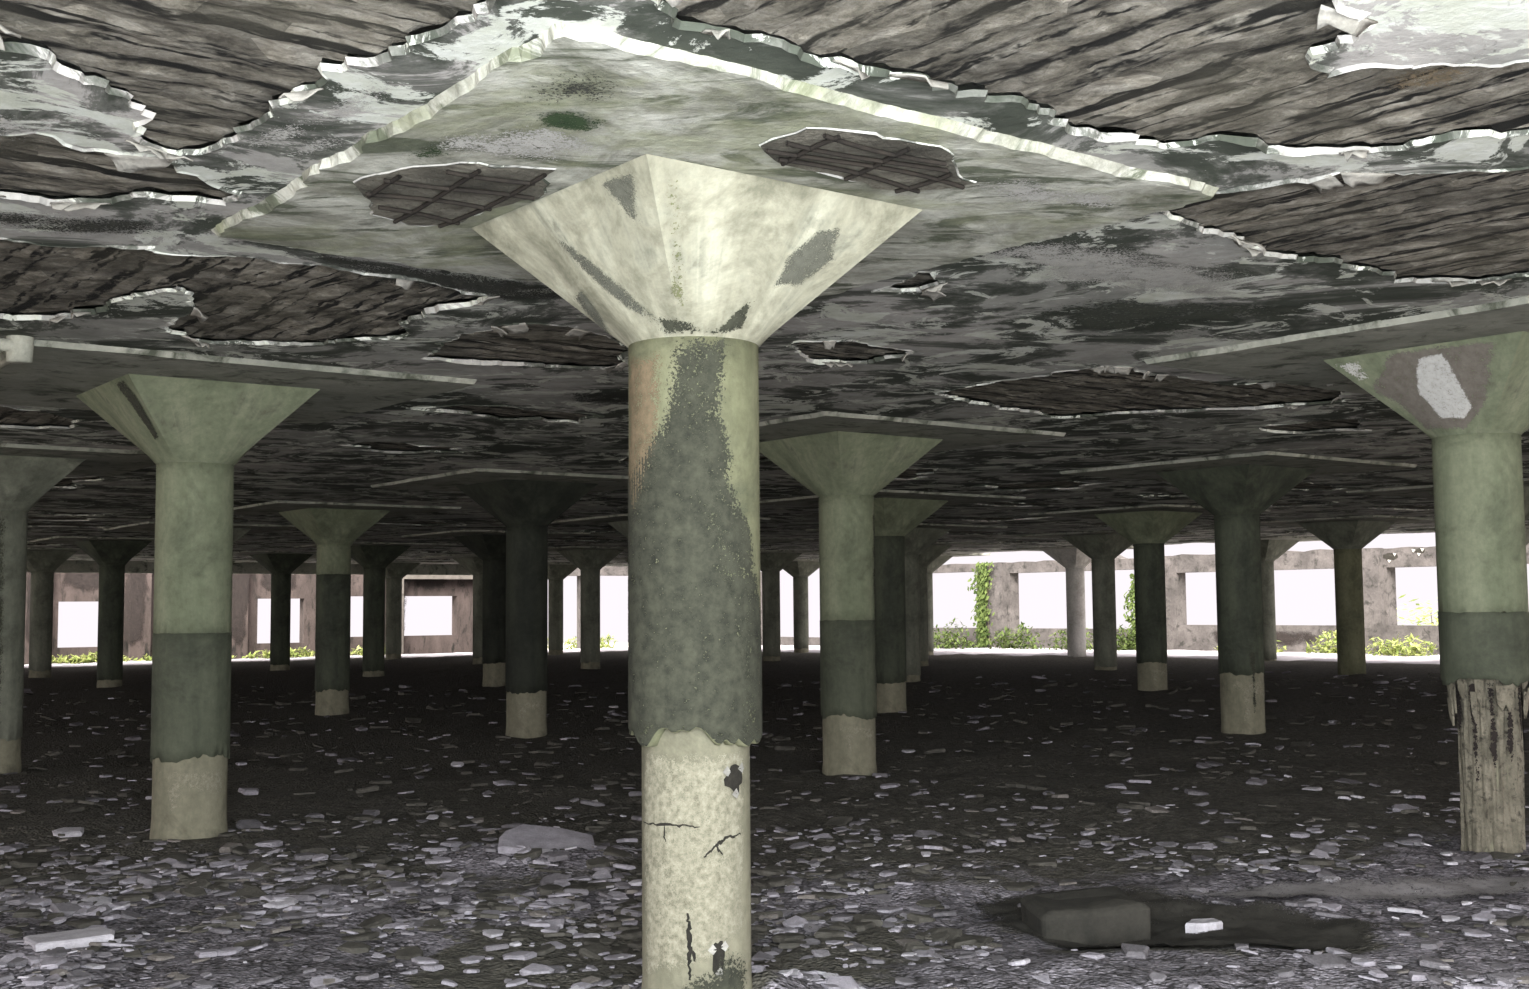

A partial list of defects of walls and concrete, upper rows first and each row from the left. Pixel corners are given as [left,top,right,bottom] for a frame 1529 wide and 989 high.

spalling [0,0,496,212]
spalling [654,0,1529,287]
spalling [353,161,557,228]
spalling [0,237,500,349]
spalling [871,271,948,302]
spalling [406,404,605,424]
spalling [420,322,628,373]
spalling [786,339,915,368]
spalling [933,361,1372,434]
peeling [1416,354,1471,419]
peeling [643,749,746,980]
crack [686,913,696,980]